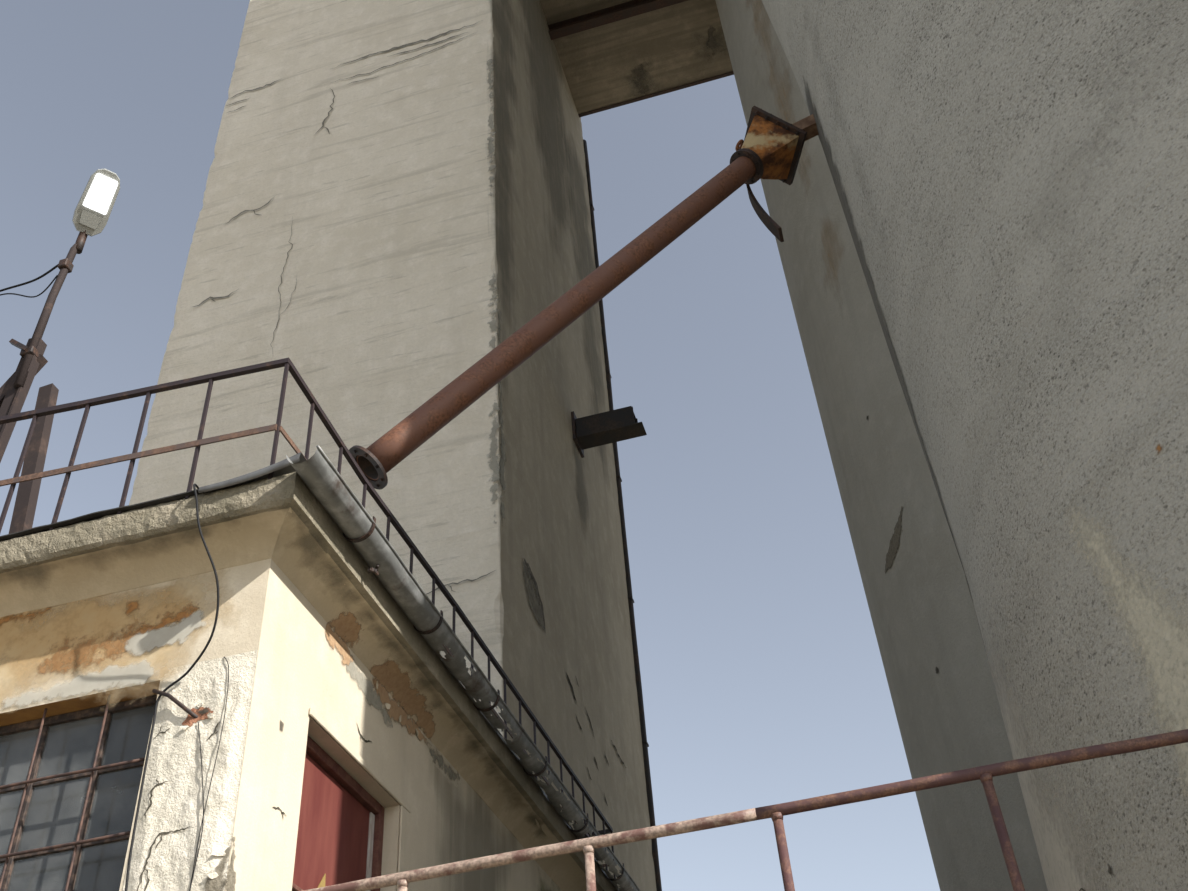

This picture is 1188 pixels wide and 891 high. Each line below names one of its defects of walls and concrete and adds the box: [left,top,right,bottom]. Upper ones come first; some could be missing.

crack [315,88,335,134]
crack [223,197,297,352]
spalling [181,702,214,731]
peeling [326,612,460,780]
crack [137,779,193,891]